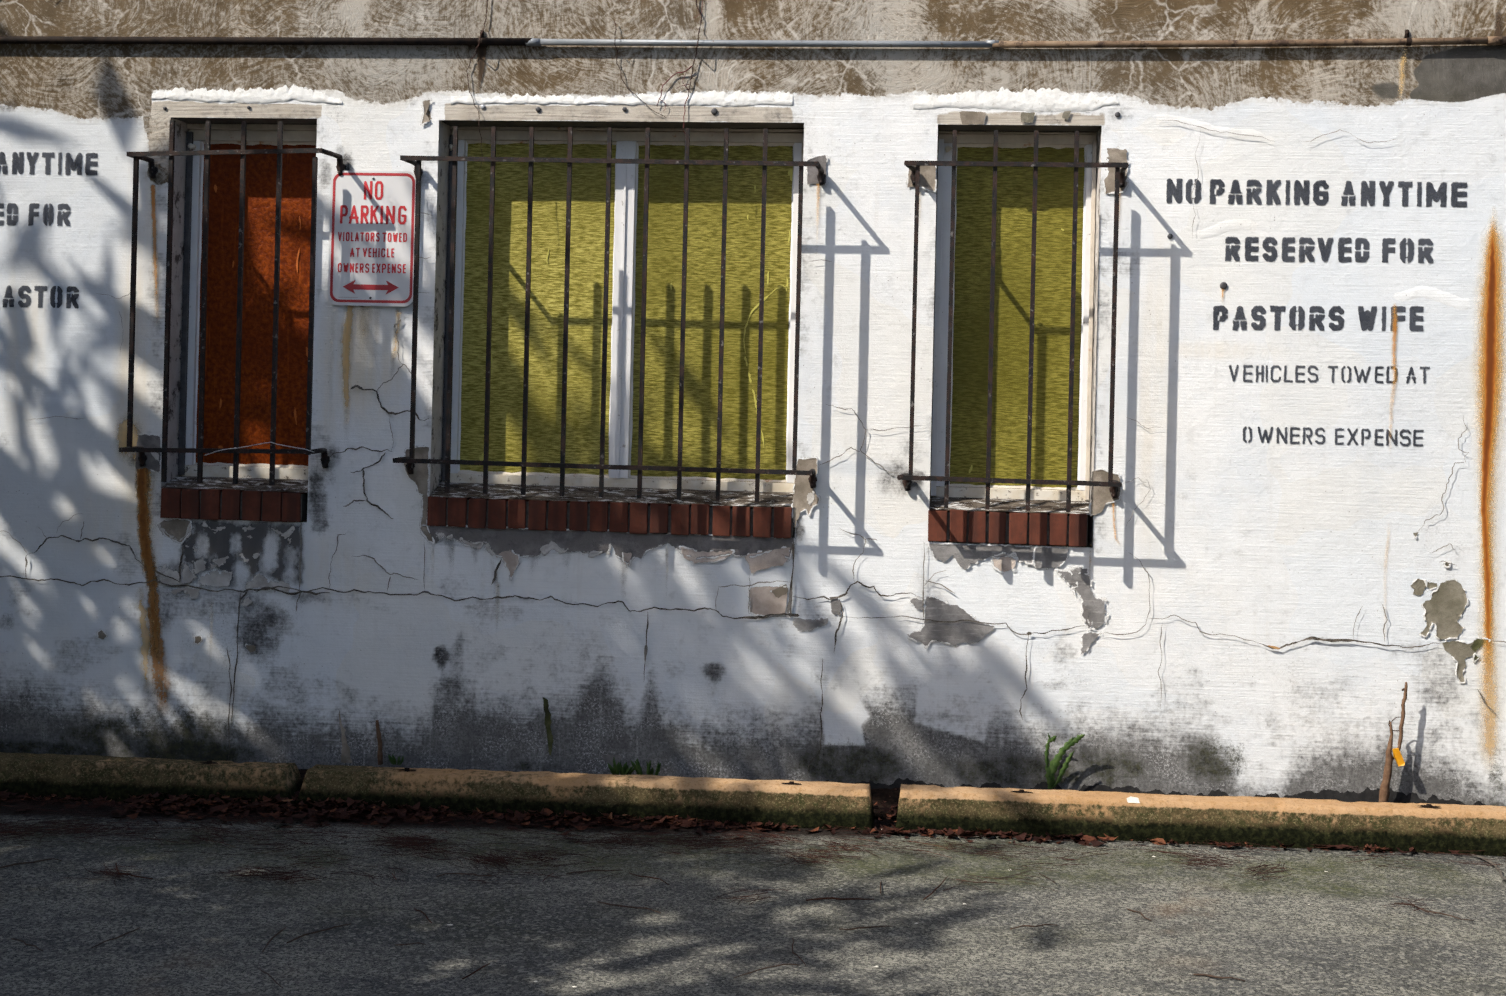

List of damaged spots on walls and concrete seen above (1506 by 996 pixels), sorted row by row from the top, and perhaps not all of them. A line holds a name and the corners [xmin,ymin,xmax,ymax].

spalling [959,111,986,125]
rust [118,420,138,447]
rust [136,468,168,707]
spalling [403,445,841,631]
crack [0,257,1444,777]
spalling [907,596,995,648]
spalling [928,542,1109,655]
spalling [1410,561,1491,684]
rust [1479,227,1503,751]
damp [855,778,1009,789]
damp [1031,782,1229,796]
damp [1254,787,1485,805]